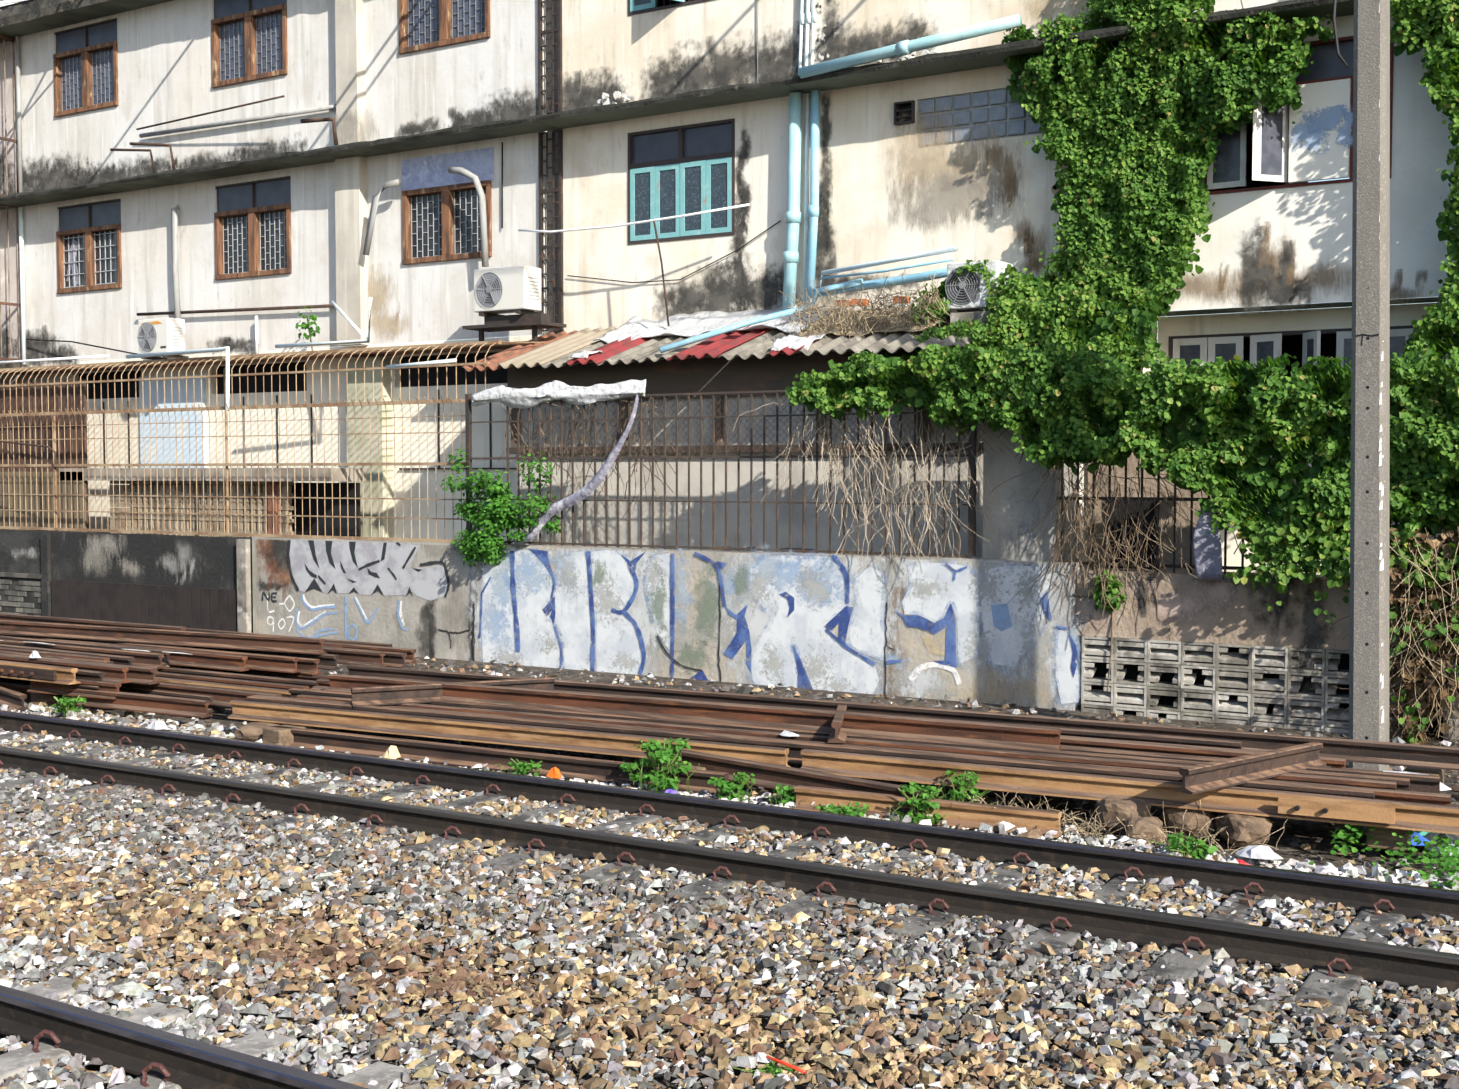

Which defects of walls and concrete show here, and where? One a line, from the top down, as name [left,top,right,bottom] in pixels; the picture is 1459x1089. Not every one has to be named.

damp [397,0,933,136]
mould [0,140,307,195]
damp [658,130,797,317]
damp [1174,226,1350,314]